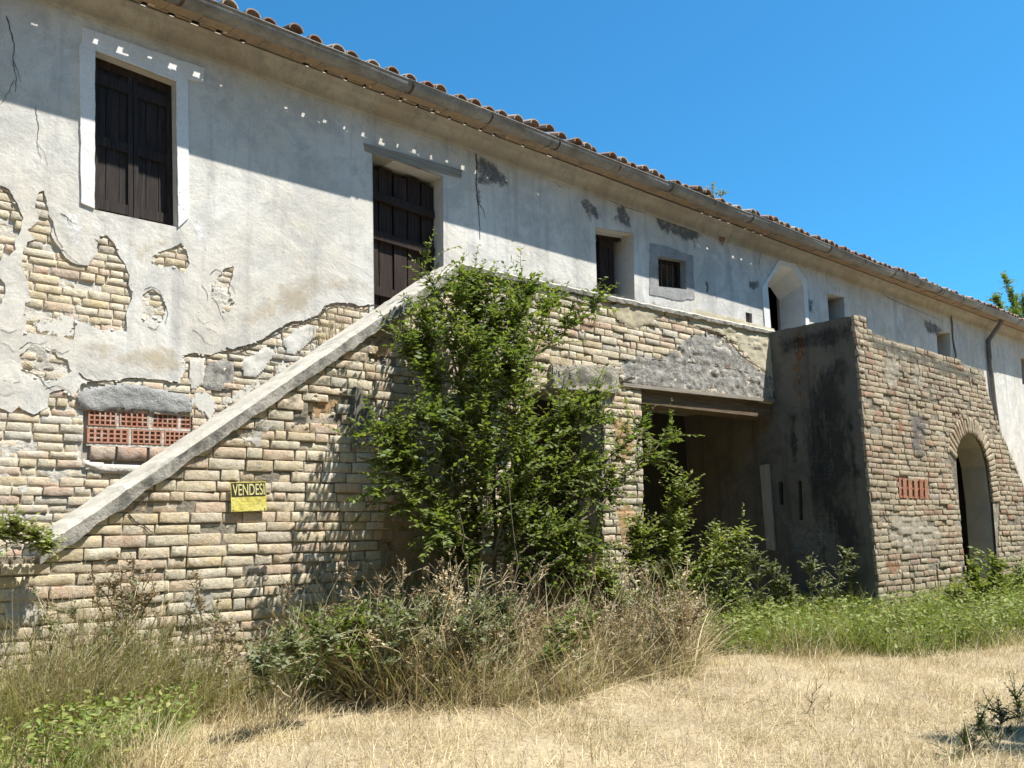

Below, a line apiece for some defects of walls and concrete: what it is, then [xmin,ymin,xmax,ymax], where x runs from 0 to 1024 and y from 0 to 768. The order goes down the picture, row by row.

crack [3,16,48,165]
peeling [152,243,189,273]
crack [475,153,485,234]
damp [478,157,508,202]
damp [617,206,630,227]
damp [657,218,698,247]
peeling [0,185,168,396]
peeling [202,267,236,323]
spalling [291,391,342,429]
damp [792,361,858,564]